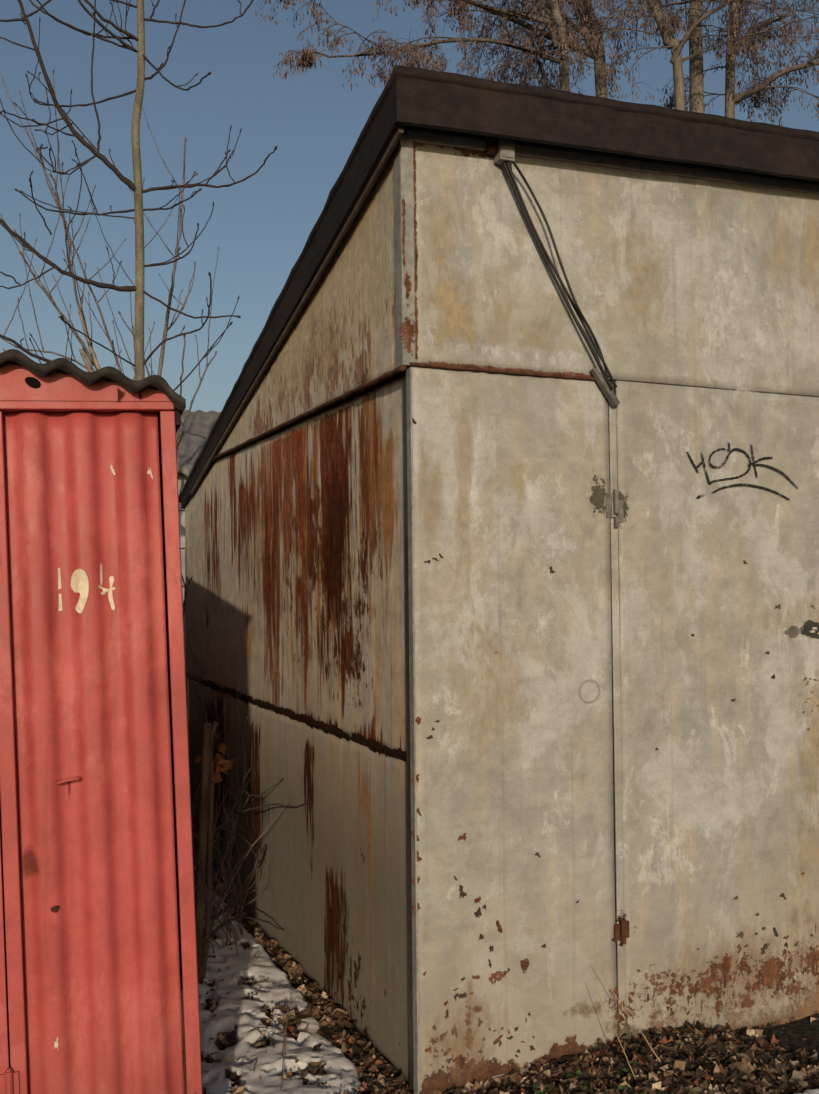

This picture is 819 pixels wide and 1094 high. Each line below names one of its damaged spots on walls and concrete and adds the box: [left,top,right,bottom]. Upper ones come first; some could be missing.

rust [201,131,593,899]
peeling [589,474,629,527]
rust [322,865,371,1036]
spalling [425,977,473,1056]
spalling [454,876,486,918]
rust [603,925,819,1041]
spalling [736,913,814,955]